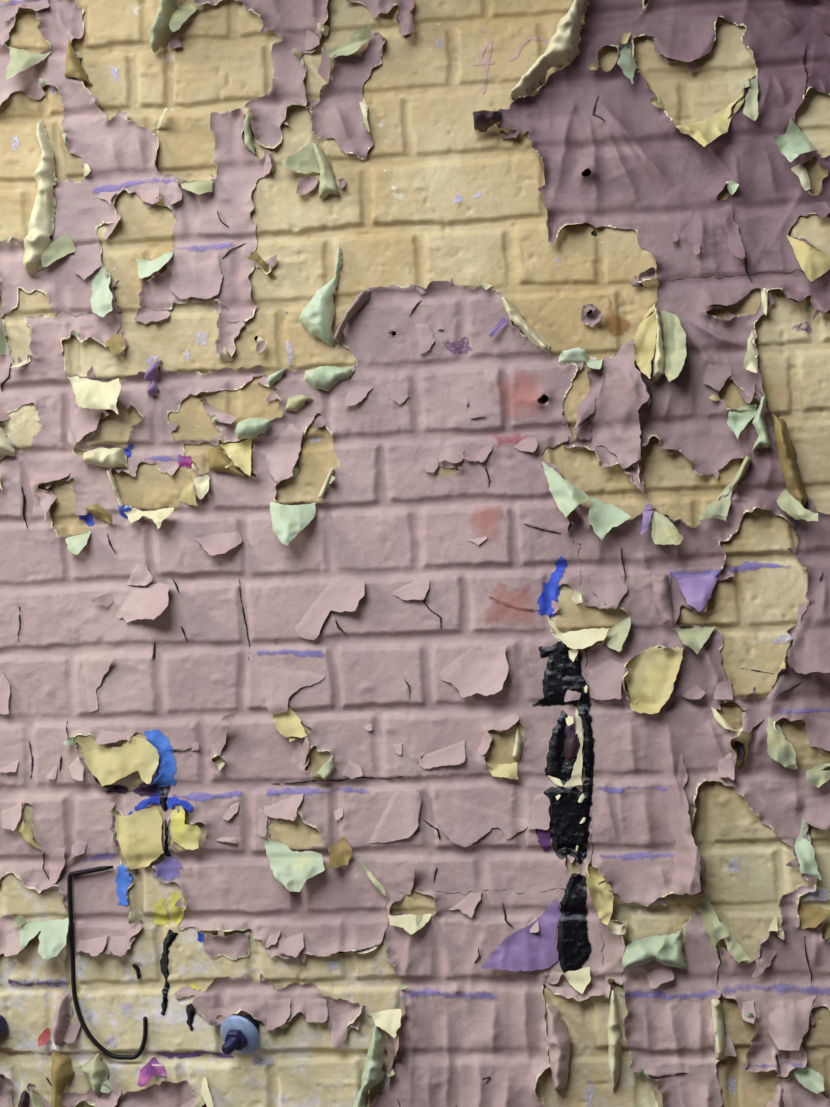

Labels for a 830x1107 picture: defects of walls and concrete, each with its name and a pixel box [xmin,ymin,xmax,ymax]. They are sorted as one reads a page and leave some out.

peeling [0,0,386,362]
peeling [0,246,751,1107]
peeling [346,0,415,39]
peeling [473,0,830,1107]